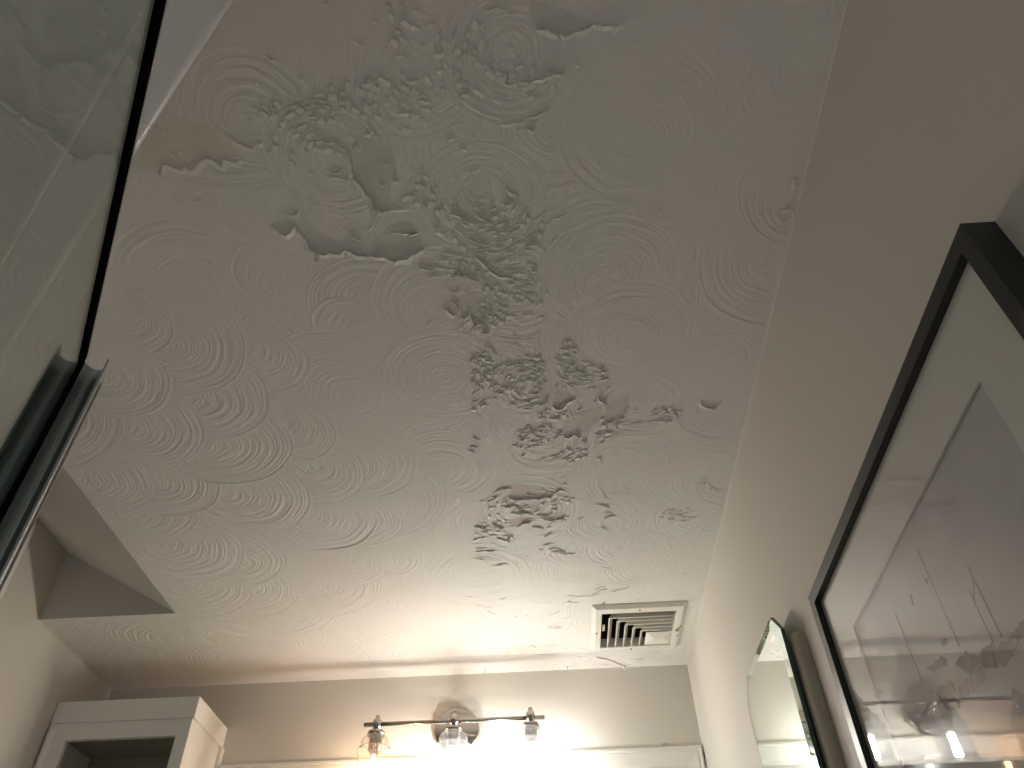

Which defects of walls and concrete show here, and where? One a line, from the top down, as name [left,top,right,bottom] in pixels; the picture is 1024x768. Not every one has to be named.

peeling [138,116,261,178]
peeling [269,211,426,266]
peeling [469,351,575,422]
peeling [473,483,583,566]